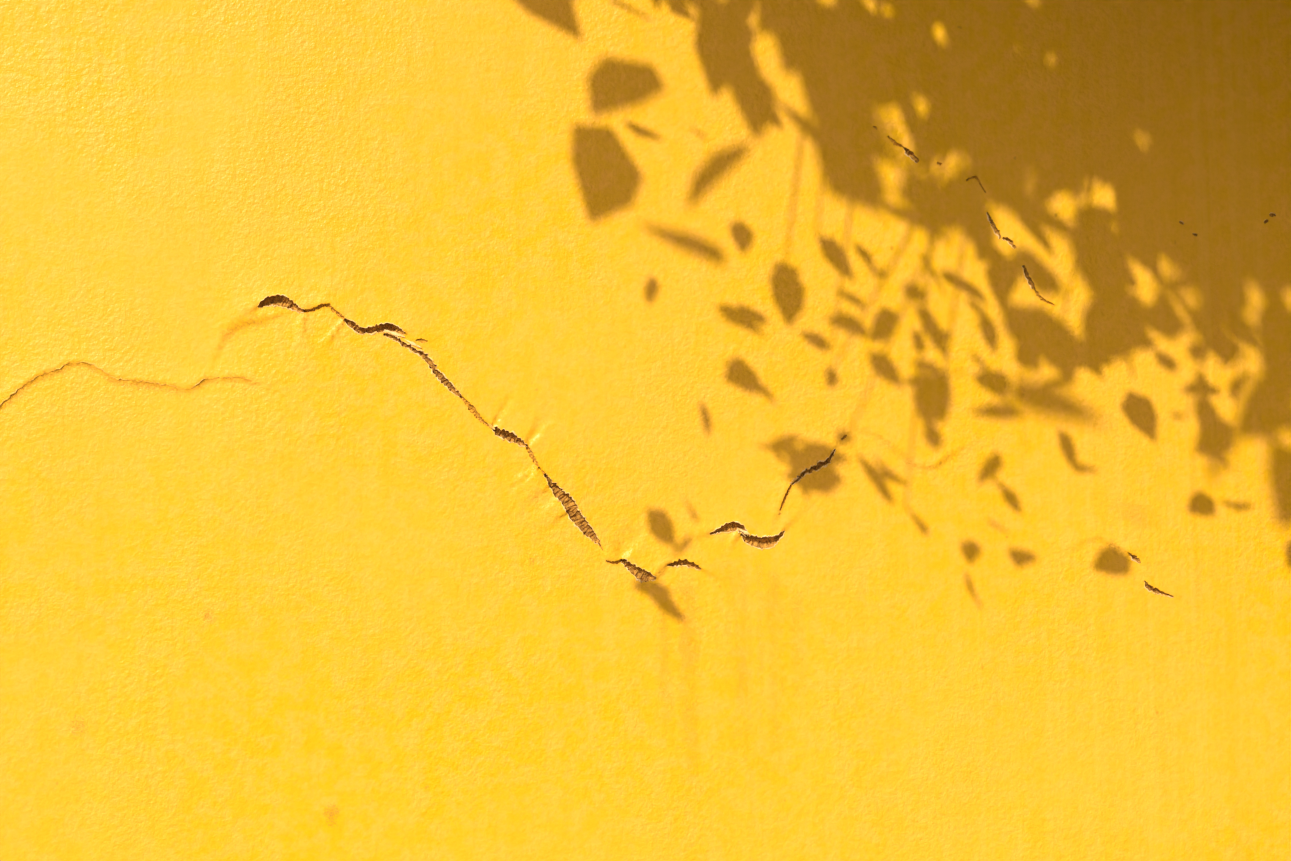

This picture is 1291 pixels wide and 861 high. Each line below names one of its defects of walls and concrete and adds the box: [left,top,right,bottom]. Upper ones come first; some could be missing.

crack [873,126,1054,306]
crack [0,360,259,418]
crack [218,293,701,583]
crack [710,433,957,550]
crack [1090,536,1174,598]